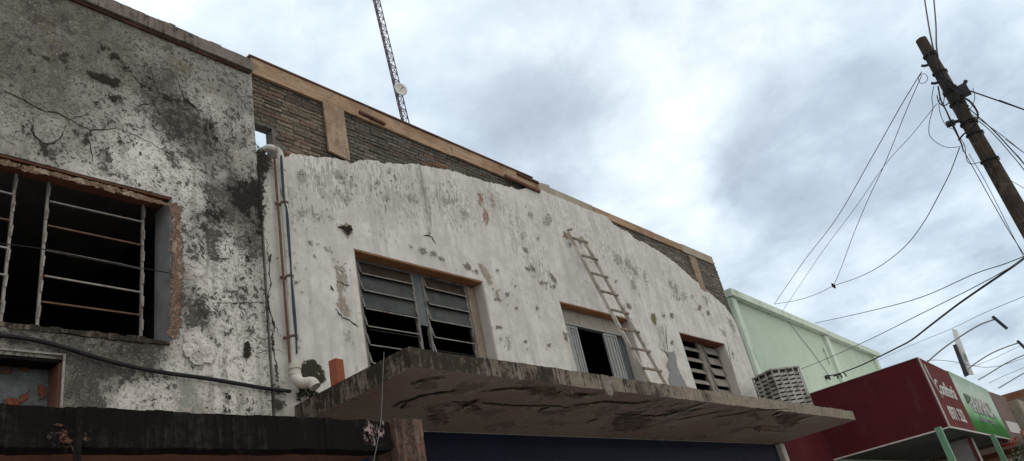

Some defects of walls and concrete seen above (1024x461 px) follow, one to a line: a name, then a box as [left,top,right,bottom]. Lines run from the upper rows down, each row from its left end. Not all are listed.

crack [5,90,181,162]
crack [123,67,202,112]
leakage [149,93,225,156]
flaking render [0,159,185,356]
leakage [177,275,222,327]
leakage [187,143,273,304]
peeling [291,161,357,238]
peeling [308,240,357,345]
spalling [661,336,687,387]
crack [393,377,783,420]